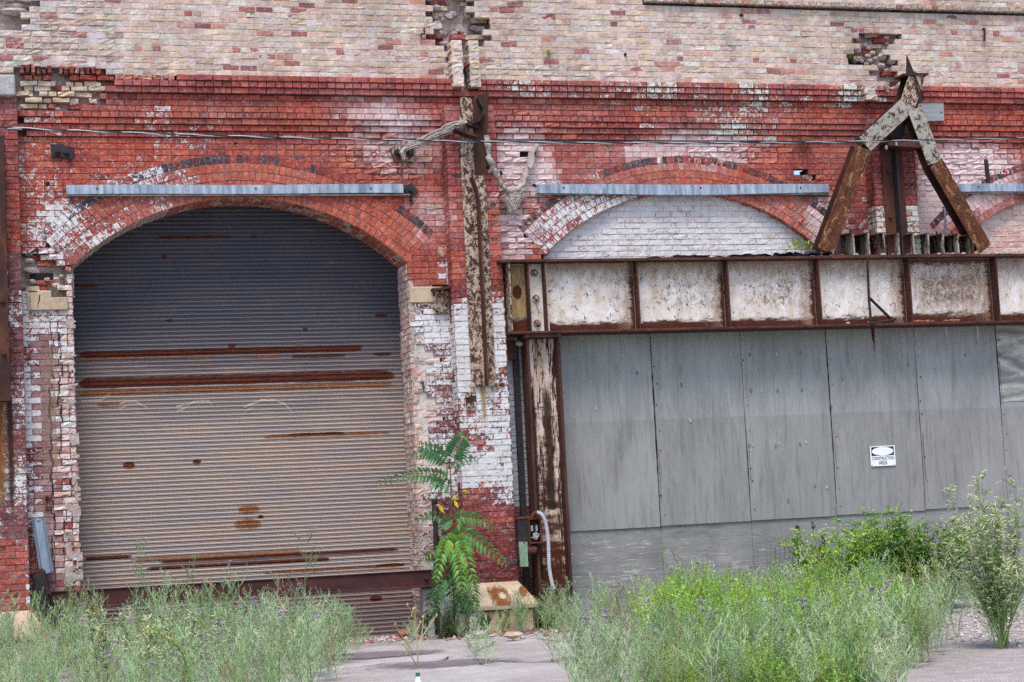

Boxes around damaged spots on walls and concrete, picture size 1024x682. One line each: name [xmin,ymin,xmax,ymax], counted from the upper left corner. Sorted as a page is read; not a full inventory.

spalling [426,0,490,91]
peeling [568,81,811,141]
peeling [824,85,863,108]
spalling [847,34,901,101]
peeling [2,65,220,605]
rust [79,343,362,360]
rust [547,258,1024,351]
rust [79,370,395,406]
peeling [409,292,529,540]
rust [236,505,263,529]
rust [532,388,568,626]
rust [85,548,404,574]